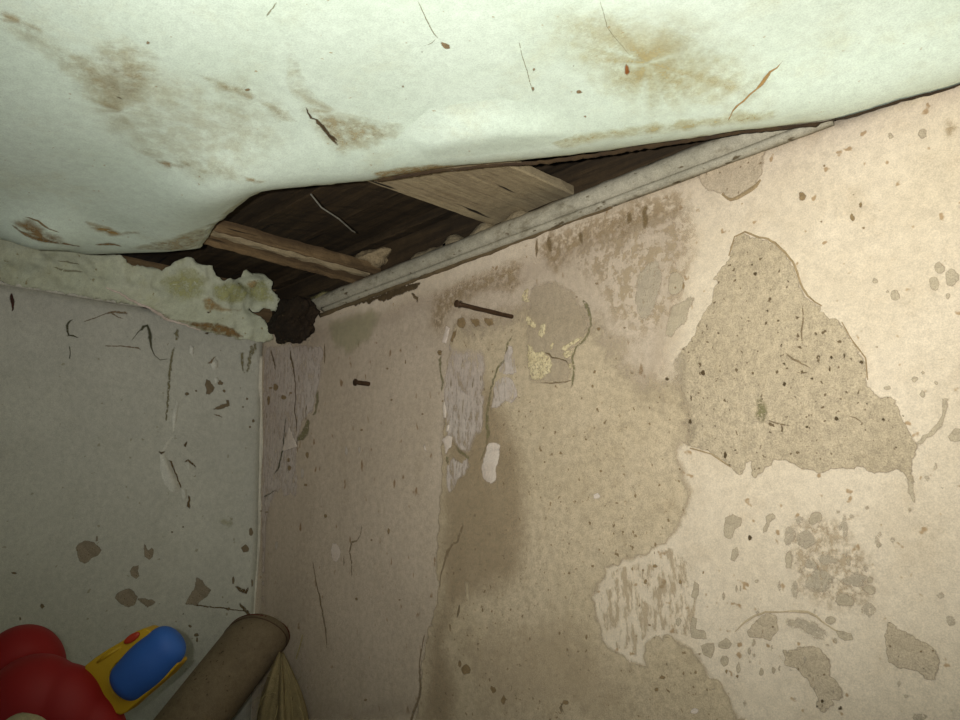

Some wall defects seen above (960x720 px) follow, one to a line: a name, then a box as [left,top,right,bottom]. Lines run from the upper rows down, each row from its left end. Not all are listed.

peeling [699,151,765,201]
peeling [0,239,280,343]
spalling [355,282,420,306]
peeling [929,262,959,299]
flaking render [416,231,940,720]
peeling [76,536,101,563]
peeling [130,545,154,579]
crack [440,524,463,582]
peeling [115,589,155,607]
peeling [183,578,211,614]
crack [411,635,425,720]